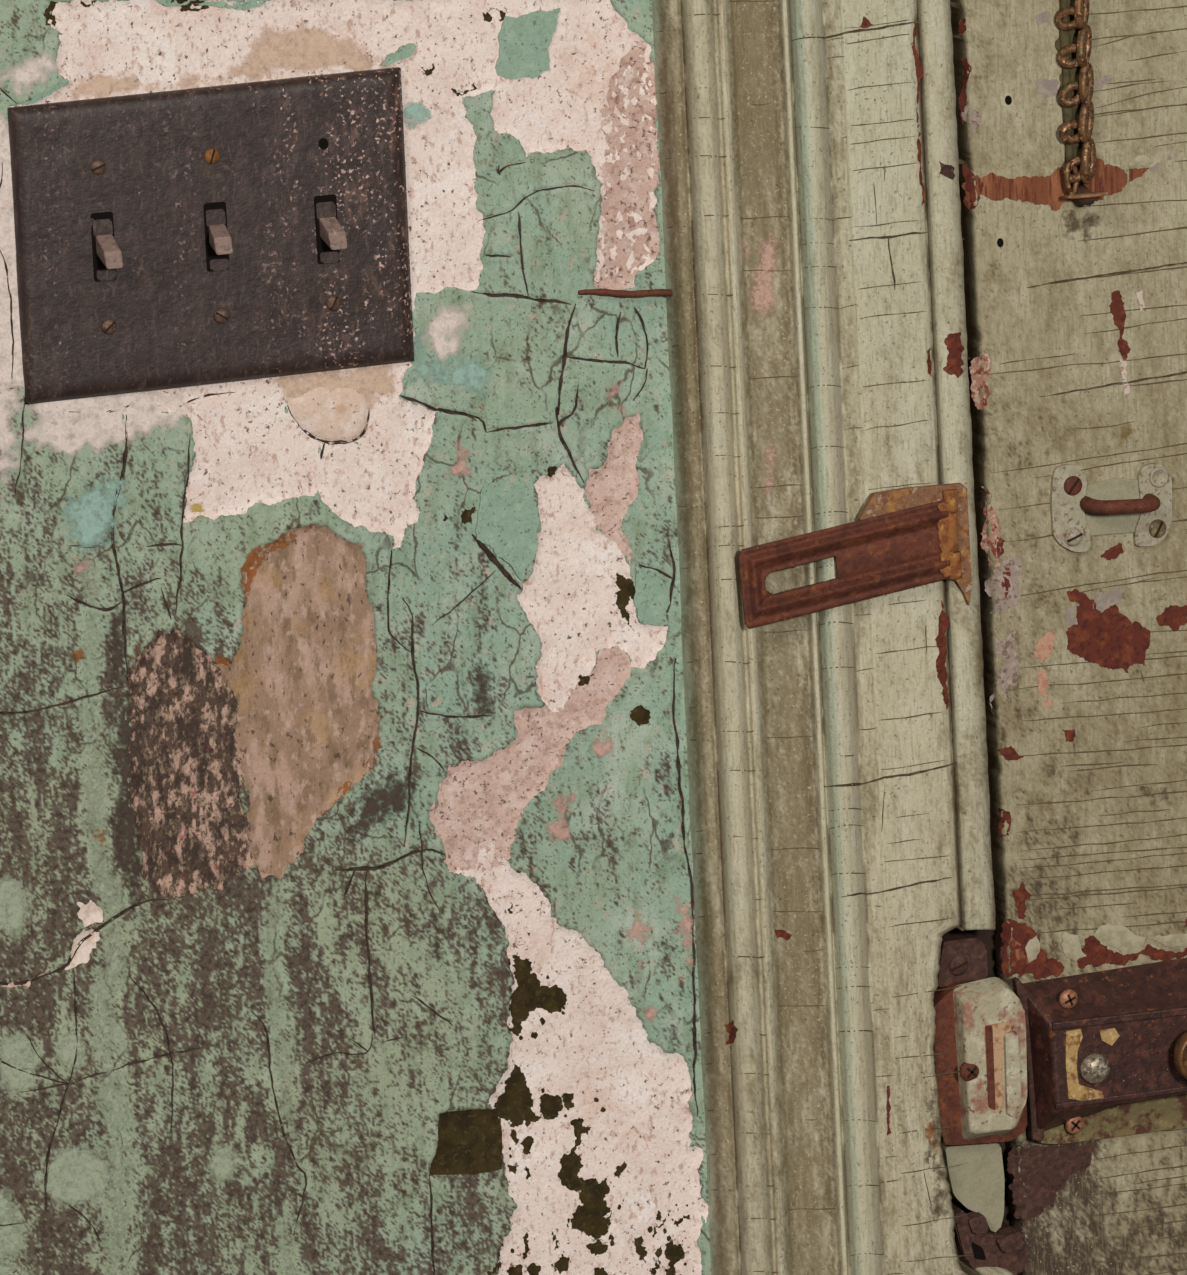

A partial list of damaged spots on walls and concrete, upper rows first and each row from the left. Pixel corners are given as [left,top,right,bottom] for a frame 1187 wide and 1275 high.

crack [0,405,190,714]
crack [283,398,370,459]
peeling [0,0,660,900]
crack [400,185,928,483]
crack [667,119,927,319]
peeling [912,18,926,207]
peeling [958,58,982,136]
peeling [939,154,1171,211]
peeling [429,380,708,1275]
crack [672,658,960,1155]
crack [1012,630,1187,946]
rust [984,1021,1011,1113]